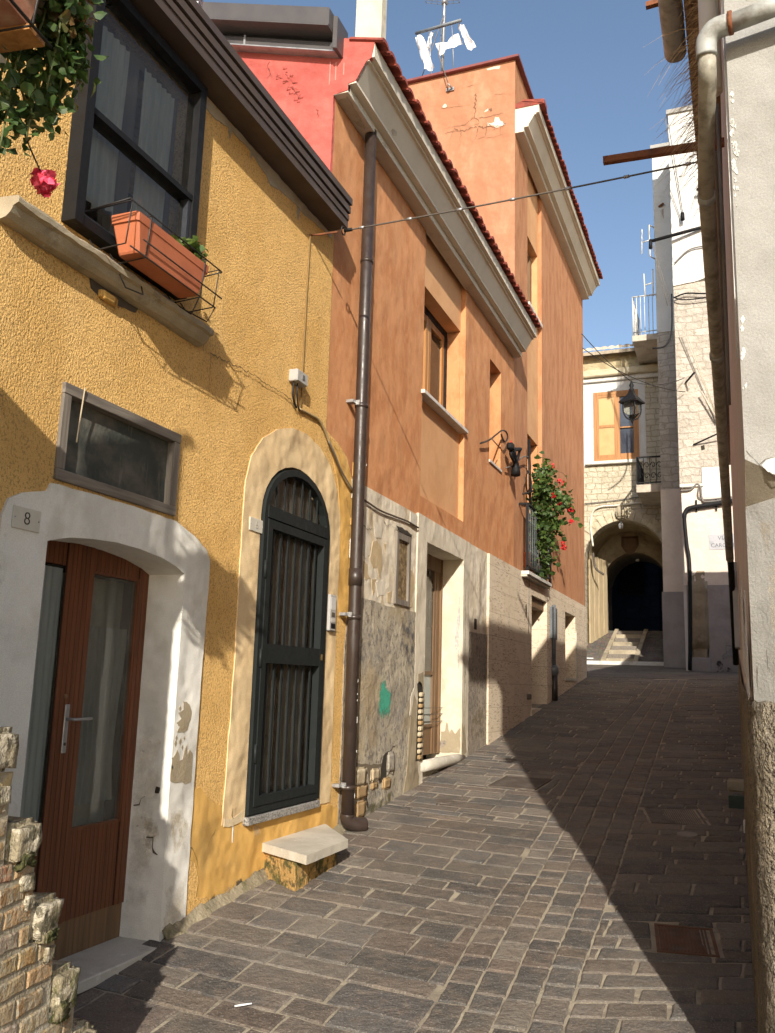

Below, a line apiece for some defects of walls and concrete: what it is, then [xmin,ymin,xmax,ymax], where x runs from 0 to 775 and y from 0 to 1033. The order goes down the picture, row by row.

crack [442,85,510,142]
flaking render [760,457,775,476]
peeling [134,701,193,806]